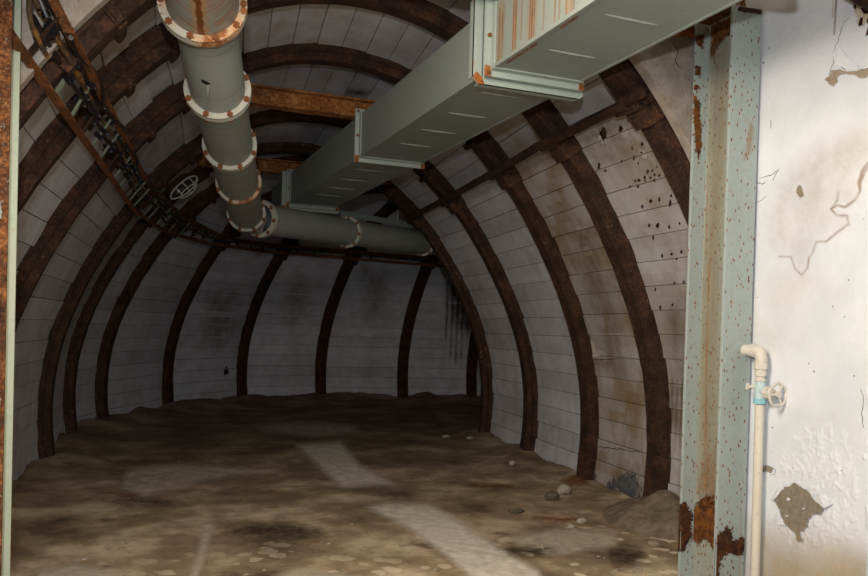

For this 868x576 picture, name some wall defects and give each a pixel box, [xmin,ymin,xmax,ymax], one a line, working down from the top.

rust [675,17,731,60]
spalling [825,3,868,87]
rust [692,65,704,164]
rust [678,476,745,576]
spalling [771,482,832,542]